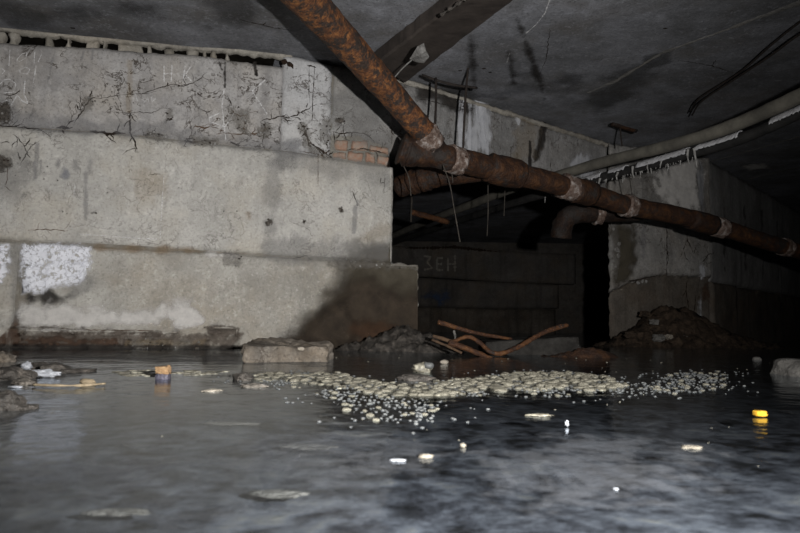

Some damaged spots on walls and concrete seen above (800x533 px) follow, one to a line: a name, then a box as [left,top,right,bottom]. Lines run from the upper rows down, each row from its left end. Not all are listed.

water stain [525,44,542,87]
crack [0,74,399,191]
water stain [0,290,243,349]
water stain [294,246,418,349]